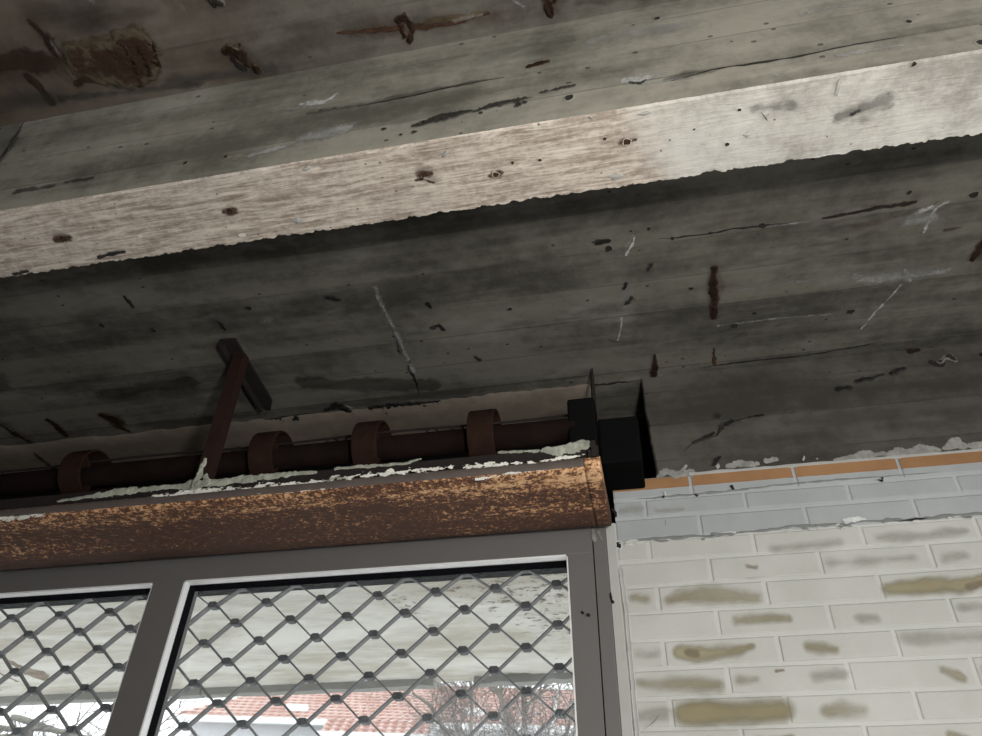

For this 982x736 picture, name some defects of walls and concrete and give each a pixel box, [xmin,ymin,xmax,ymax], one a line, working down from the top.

spalling [27,19,163,90]
crack [0,114,74,161]
crack [683,414,764,452]